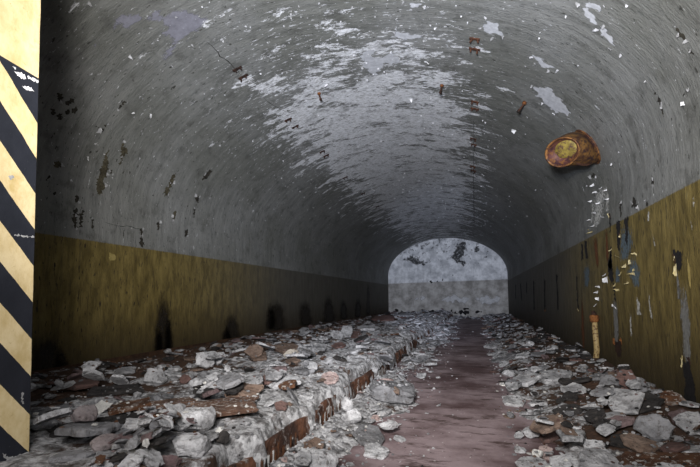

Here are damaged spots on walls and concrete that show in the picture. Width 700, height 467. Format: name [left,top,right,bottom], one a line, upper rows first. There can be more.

peeling [575,2,615,50]
peeling [530,85,571,126]
peeling [95,140,128,196]
peeling [586,173,611,234]
peeling [584,226,640,306]
water stain [155,302,173,351]